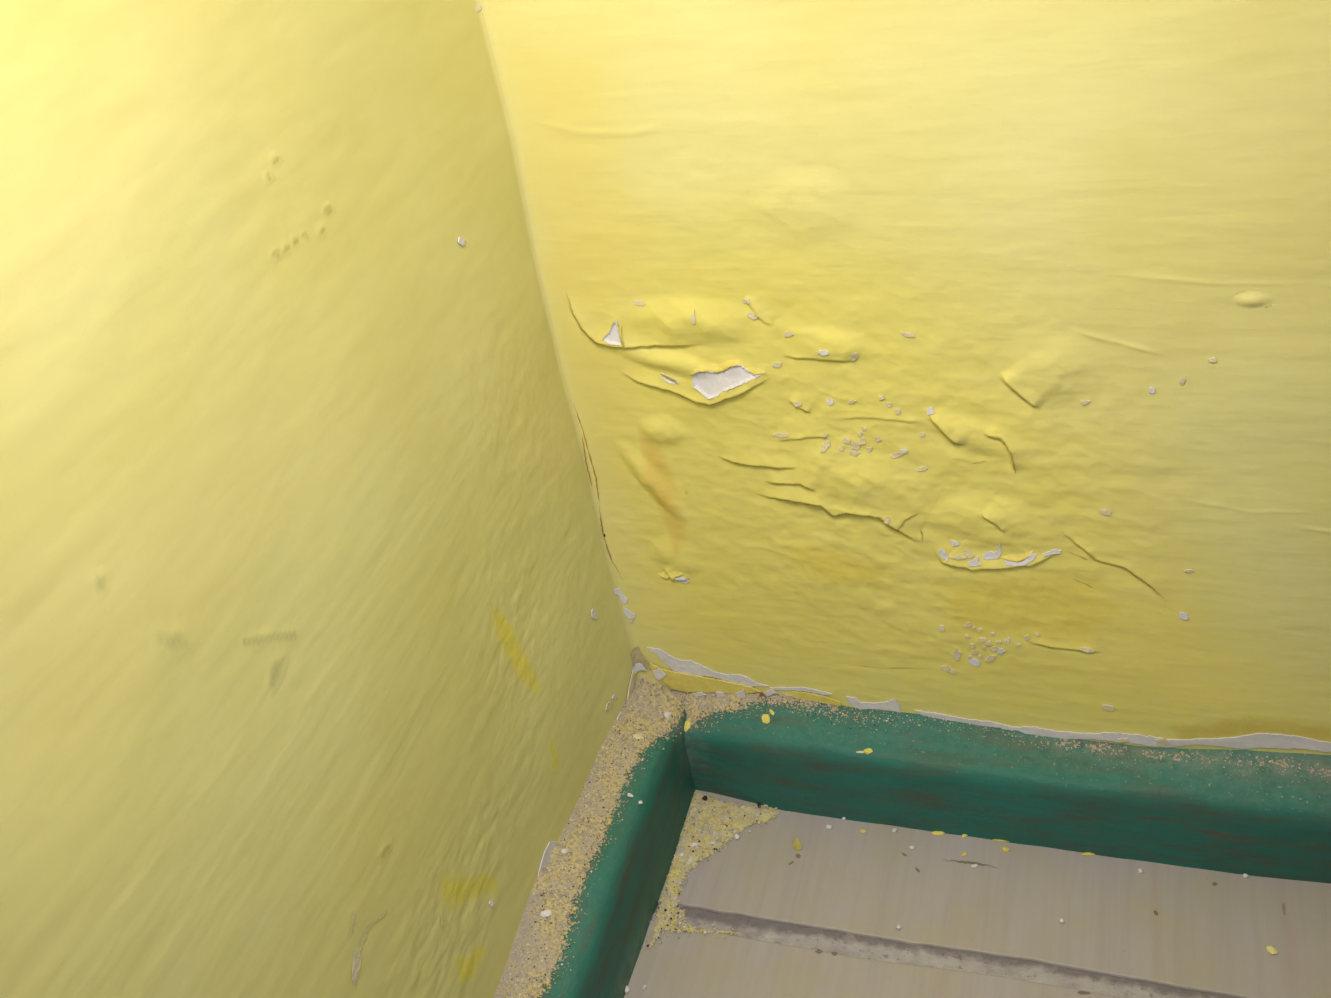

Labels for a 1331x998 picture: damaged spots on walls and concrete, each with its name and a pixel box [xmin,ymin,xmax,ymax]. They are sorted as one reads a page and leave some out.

peeling [602,319,625,346]
peeling [661,360,781,399]
leakage [482,0,1331,755]
peeling [820,426,882,456]
crack [928,415,1016,473]
crack [718,456,923,541]
peeling [658,571,689,584]
peeling [938,540,1061,567]
crack [1062,532,1166,601]
peeling [940,622,1040,674]
peeling [493,646,1331,998]